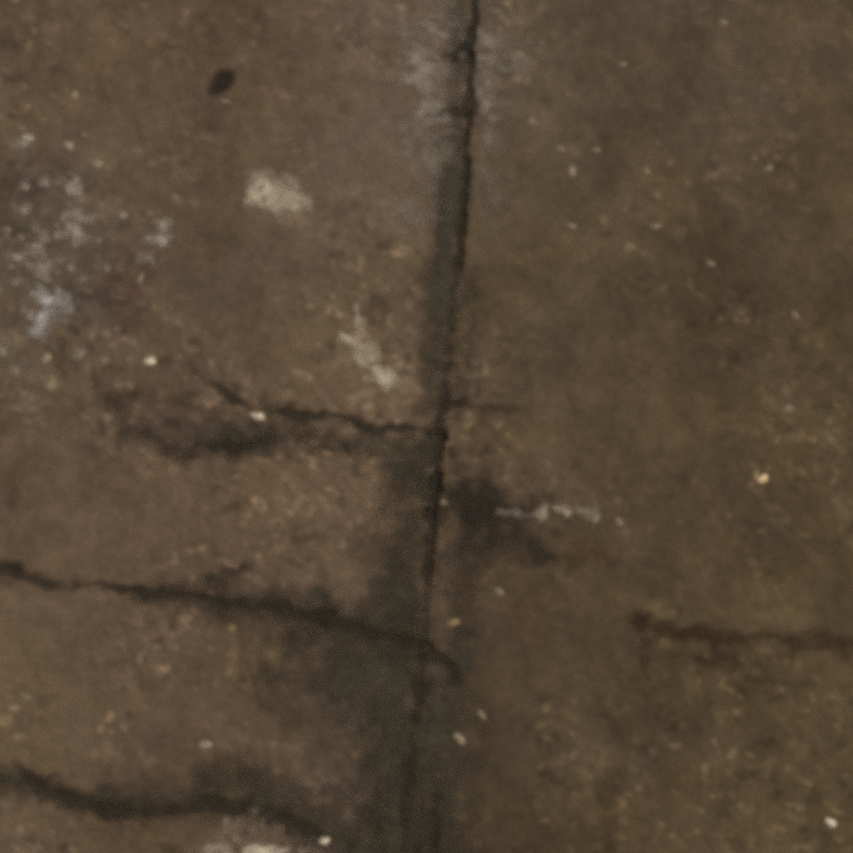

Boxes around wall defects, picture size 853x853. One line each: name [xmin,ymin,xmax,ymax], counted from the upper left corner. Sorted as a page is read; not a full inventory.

leakage [245,171,310,215]
leakage [399,21,465,415]
crack [445,0,478,286]
crack [0,562,82,589]
crack [106,326,468,719]
leakage [246,431,492,853]
leakage [449,478,553,563]
crack [20,766,321,836]